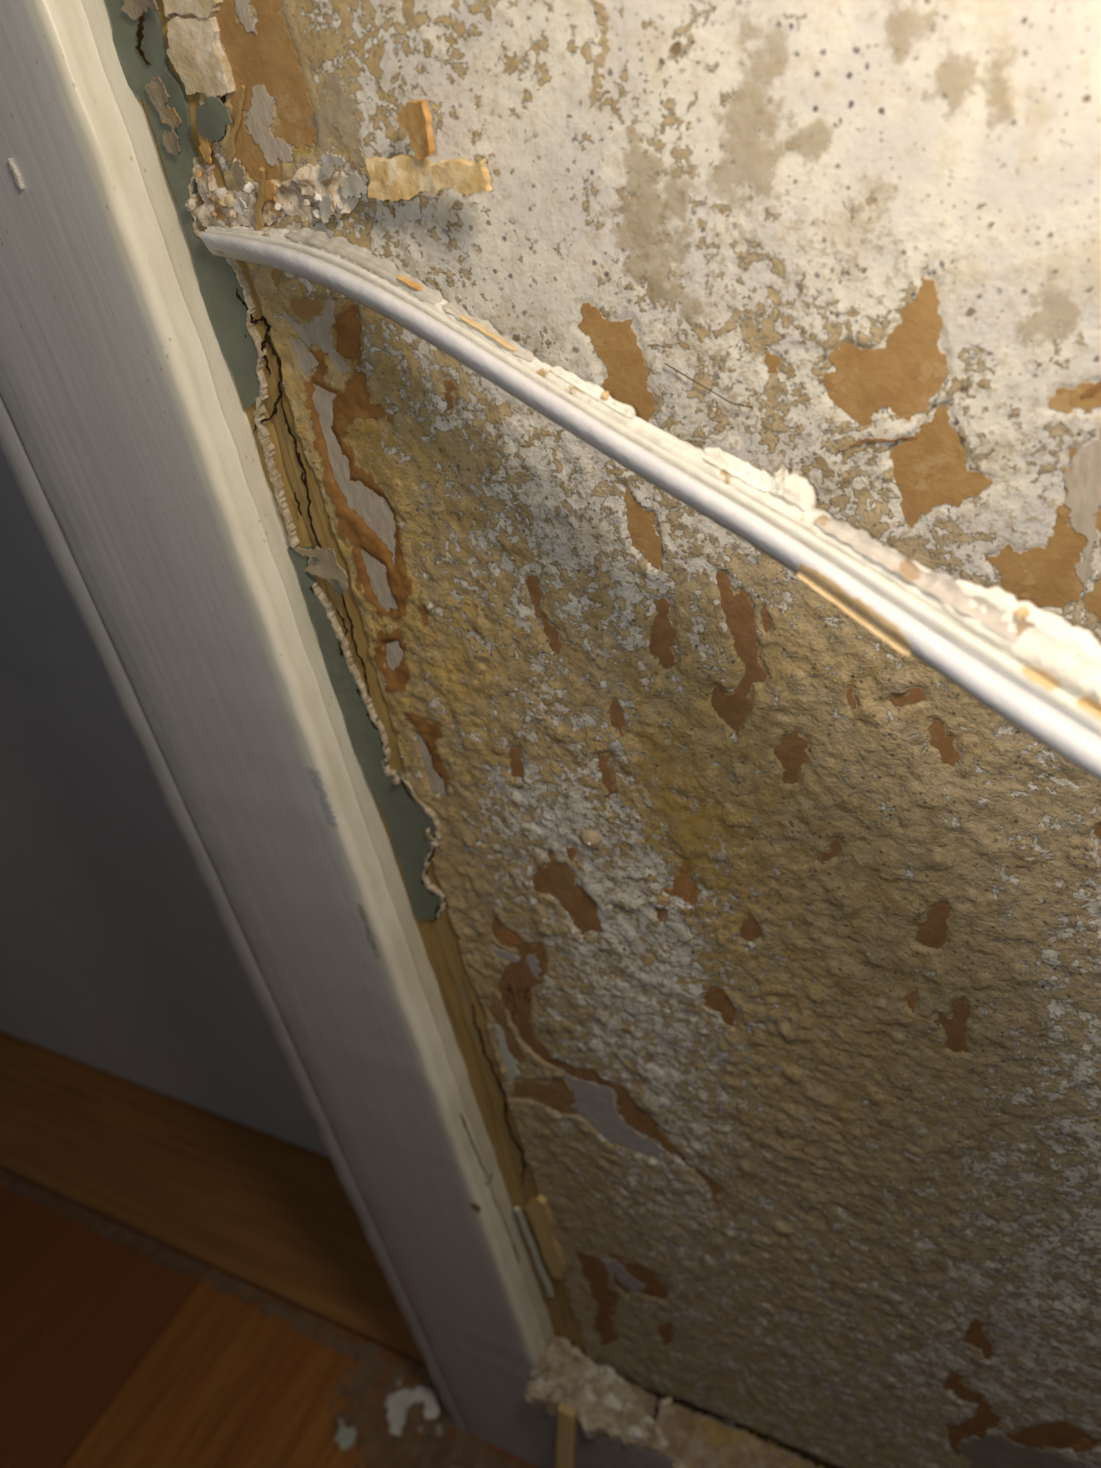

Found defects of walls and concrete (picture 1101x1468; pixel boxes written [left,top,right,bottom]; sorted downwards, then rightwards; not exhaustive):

peeling [106,0,535,411]
crack [236,288,322,549]
peeling [578,302,656,422]
crack [850,435,917,446]
peeling [823,276,993,528]
peeling [1048,380,1101,414]
peeling [797,564,912,657]
peeling [813,447,1101,643]
peeling [532,844,601,936]
peeling [477,917,724,1213]
flaking render [524,1252,673,1460]
crack [643,1389,844,1468]